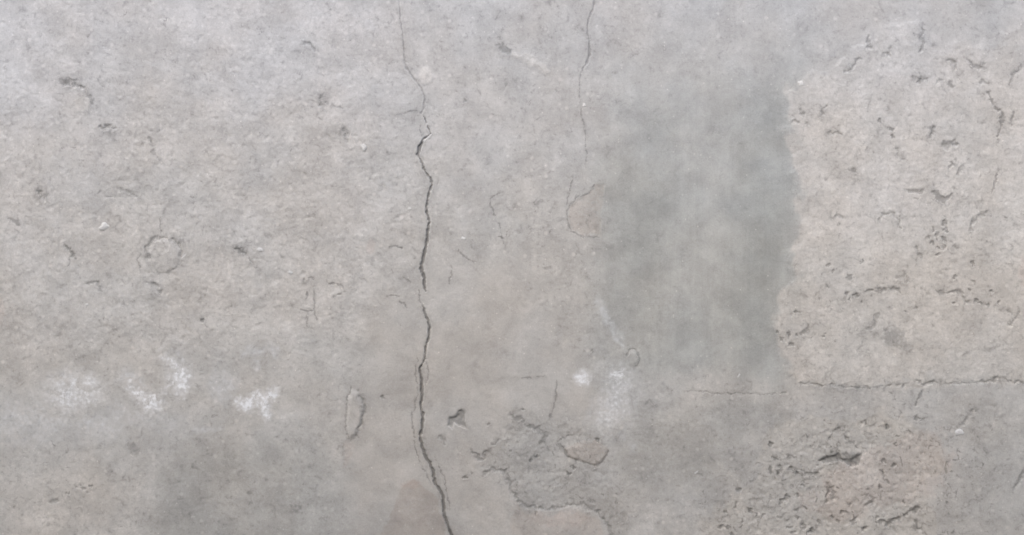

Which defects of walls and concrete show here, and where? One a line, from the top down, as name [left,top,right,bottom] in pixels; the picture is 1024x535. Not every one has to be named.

crack [578,0,598,170]
crack [385,0,475,535]
leakage [568,47,828,517]
flaking render [460,375,636,535]
crack [684,373,1024,407]